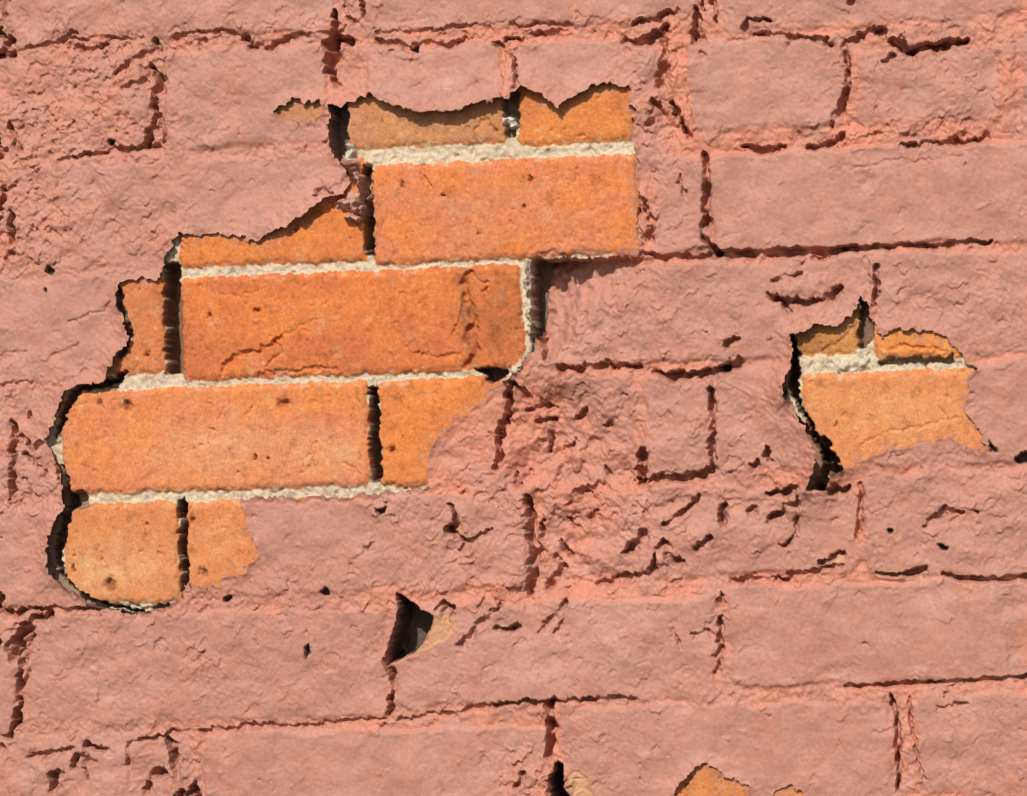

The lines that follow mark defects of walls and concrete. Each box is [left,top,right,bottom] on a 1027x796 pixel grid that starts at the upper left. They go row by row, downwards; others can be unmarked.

peeling [29,68,669,637]
peeling [763,286,986,512]
spalling [385,594,434,666]
spalling [454,603,522,648]
peeling [665,756,751,796]
peeling [774,784,804,796]